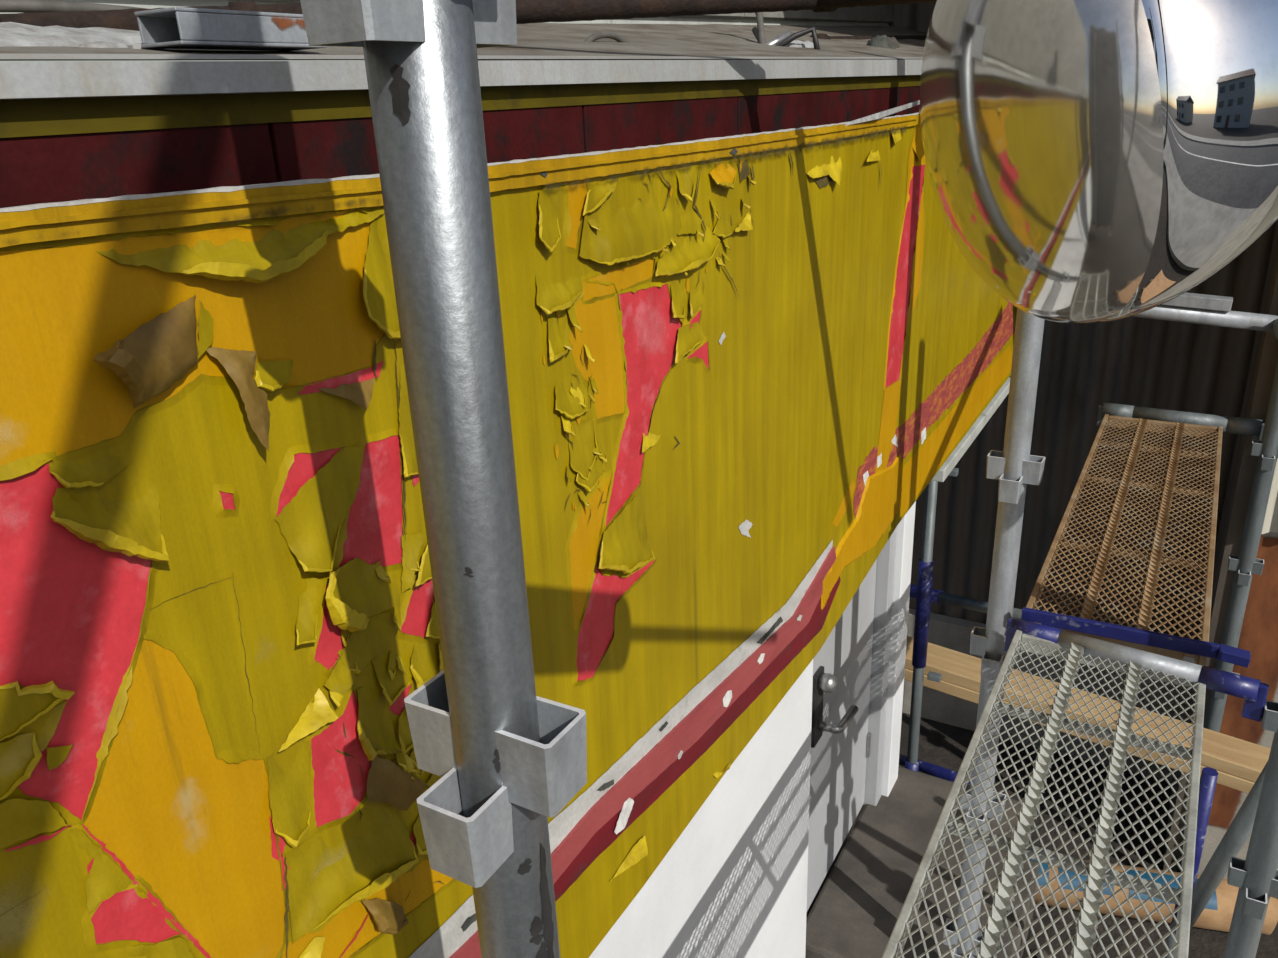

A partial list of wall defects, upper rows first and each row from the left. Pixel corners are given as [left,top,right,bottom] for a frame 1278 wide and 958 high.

peeling [0,206,457,958]
peeling [536,155,756,687]
peeling [807,156,842,188]
peeling [821,109,1015,610]